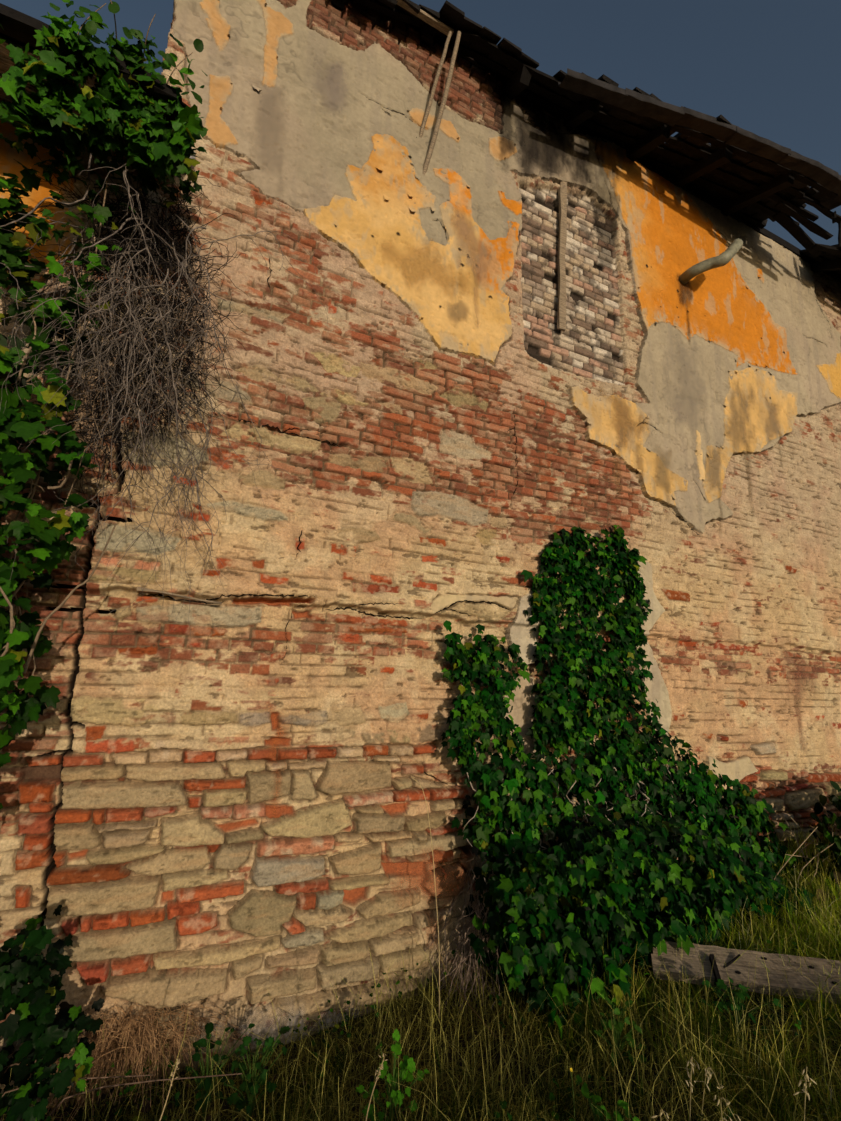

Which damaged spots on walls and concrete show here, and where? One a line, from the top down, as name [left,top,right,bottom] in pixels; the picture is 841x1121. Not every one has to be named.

peeling [200,0,231,50]
peeling [205,74,238,149]
spalling [252,0,517,161]
peeling [305,134,522,362]
peeling [571,140,798,507]
peeling [817,353,841,399]
crack [226,414,346,447]
crack [139,593,511,664]
crack [39,402,132,959]